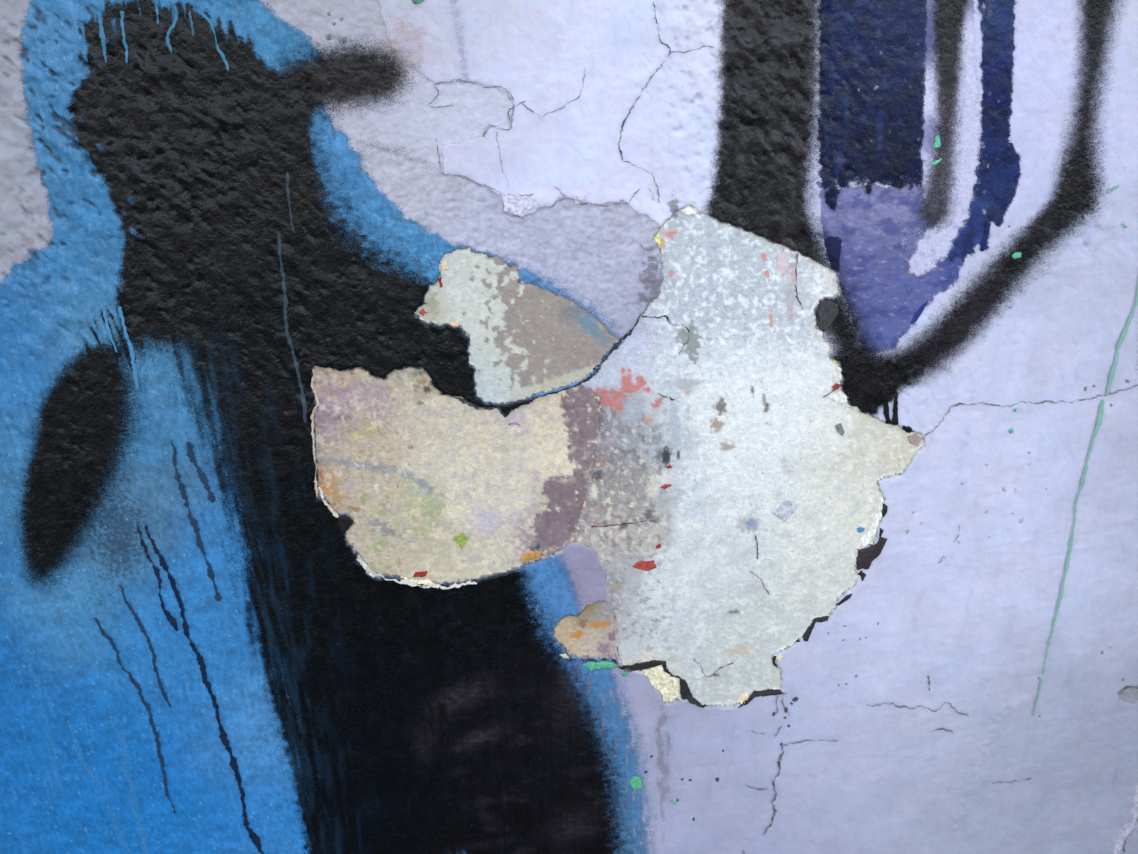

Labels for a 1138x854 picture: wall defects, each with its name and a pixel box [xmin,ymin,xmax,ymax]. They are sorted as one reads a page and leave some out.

crack [429,2,715,219]
peeling [259,0,925,708]
crack [924,385,1138,437]
crack [742,694,837,854]
crack [867,675,968,732]